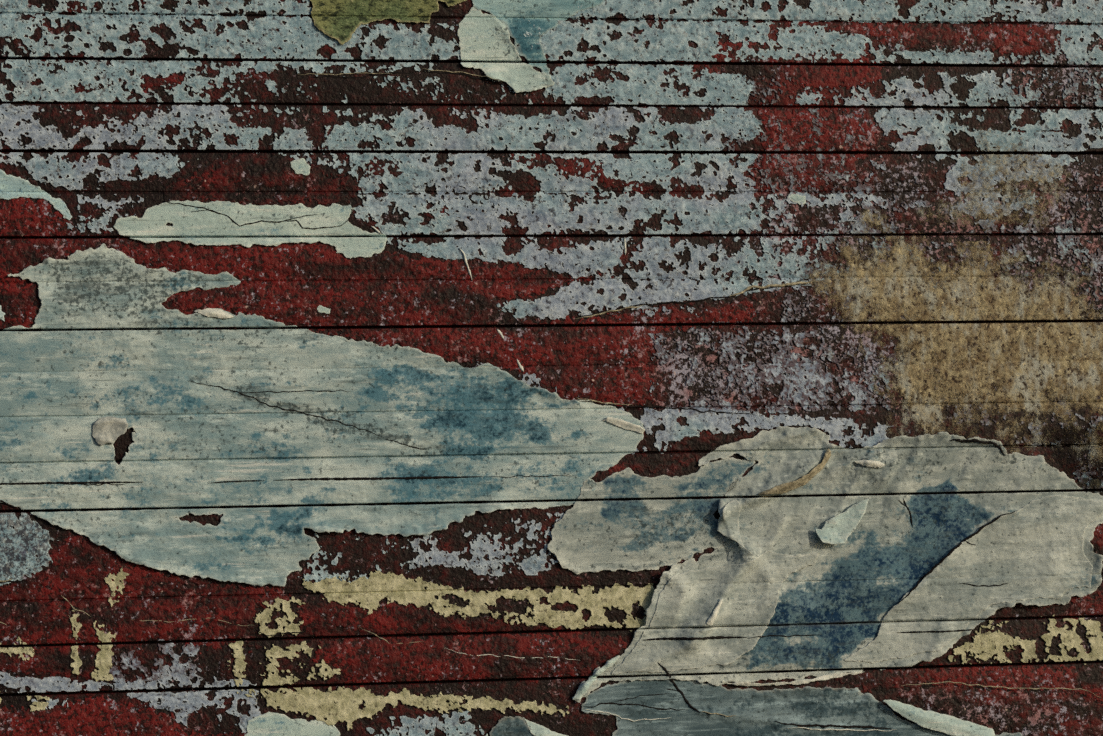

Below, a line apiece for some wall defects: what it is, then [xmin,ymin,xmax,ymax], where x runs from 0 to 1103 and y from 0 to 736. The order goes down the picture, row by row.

peeling [0,0,1103,454]
crack [191,381,426,450]
crack [213,475,567,483]
peeling [934,369,1103,493]
peeling [0,511,655,736]
peeling [948,615,1103,665]